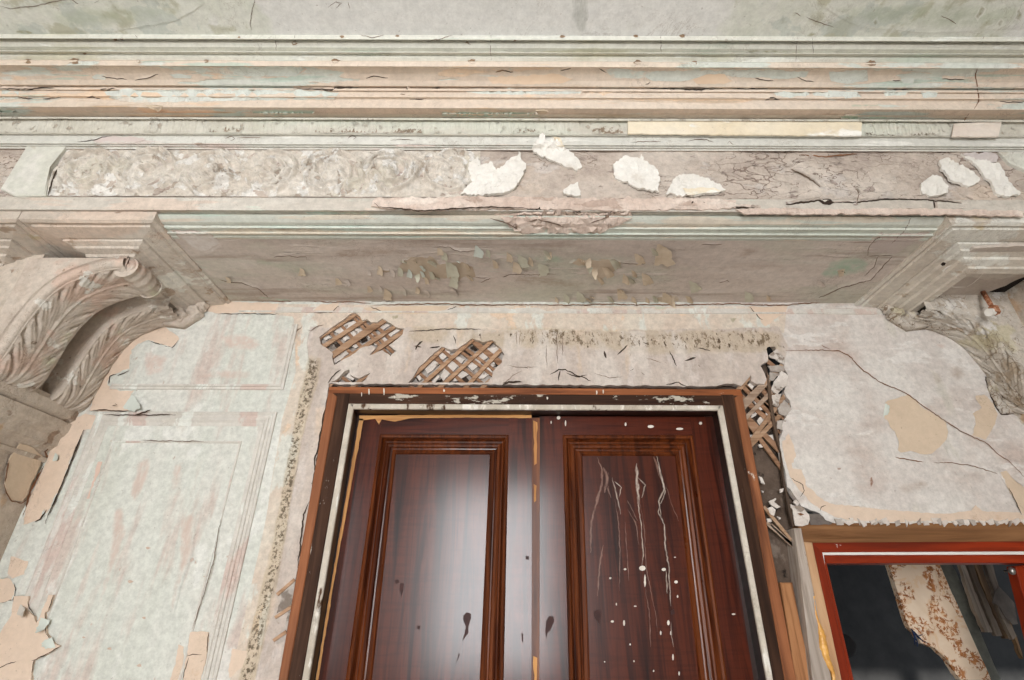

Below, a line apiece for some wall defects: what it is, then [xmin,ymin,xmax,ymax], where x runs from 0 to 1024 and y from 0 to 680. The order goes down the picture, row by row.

peeling [396,245,552,289]
crack [220,153,962,350]
peeling [555,244,702,309]
spalling [371,196,1024,218]
peeling [4,327,180,525]
crack [786,343,1024,476]
peeling [882,395,948,455]
peeling [972,394,998,440]
peeling [782,431,1024,527]
peeling [0,555,62,680]